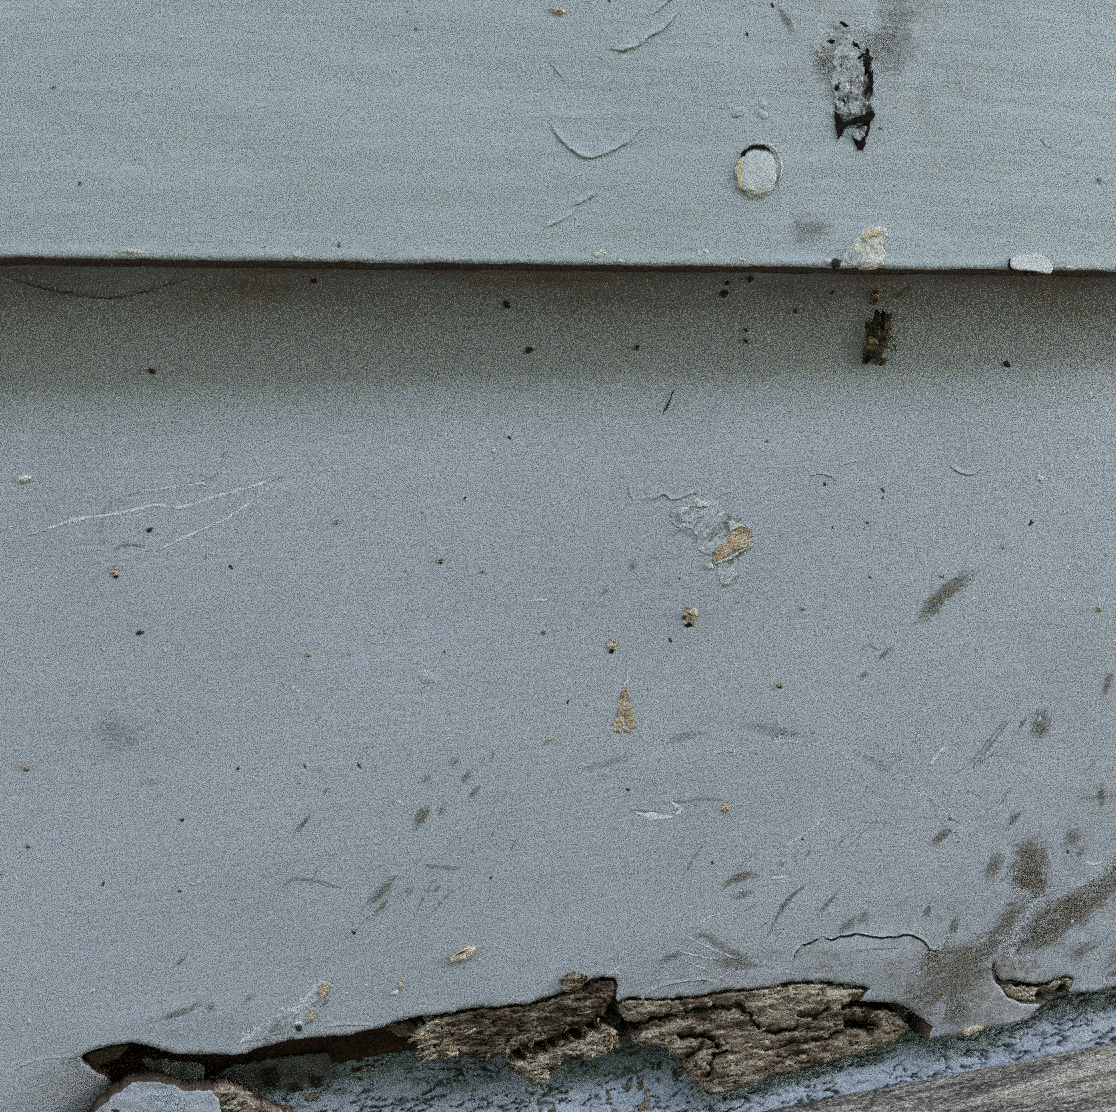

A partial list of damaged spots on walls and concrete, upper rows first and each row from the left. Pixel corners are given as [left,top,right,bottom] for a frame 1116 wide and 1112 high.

spalling [822,21,875,151]
peeling [825,226,888,270]
peeling [669,498,757,587]
crack [790,930,940,961]
peeling [238,980,335,1045]
peeling [255,987,1116,1112]